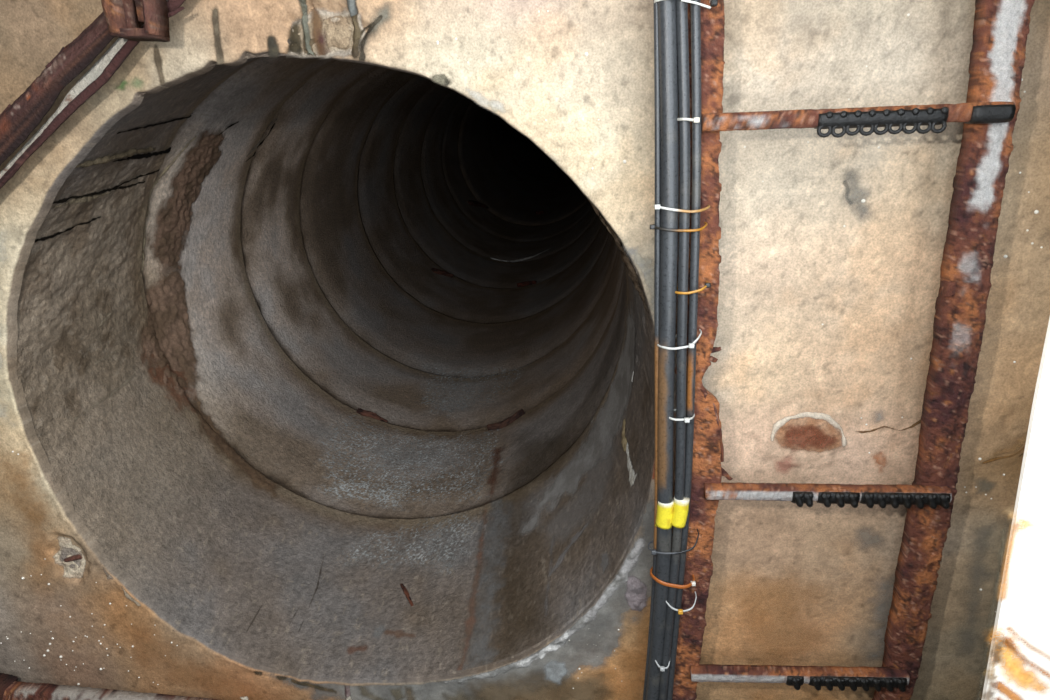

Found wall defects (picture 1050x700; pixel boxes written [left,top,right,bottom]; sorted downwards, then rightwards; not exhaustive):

spalling [583,194,646,310]
water stain [524,310,637,532]
crack [983,447,1025,464]
spalling [53,536,86,578]
rust [1001,520,1029,599]
water stain [276,502,654,700]
rust [985,628,1050,700]